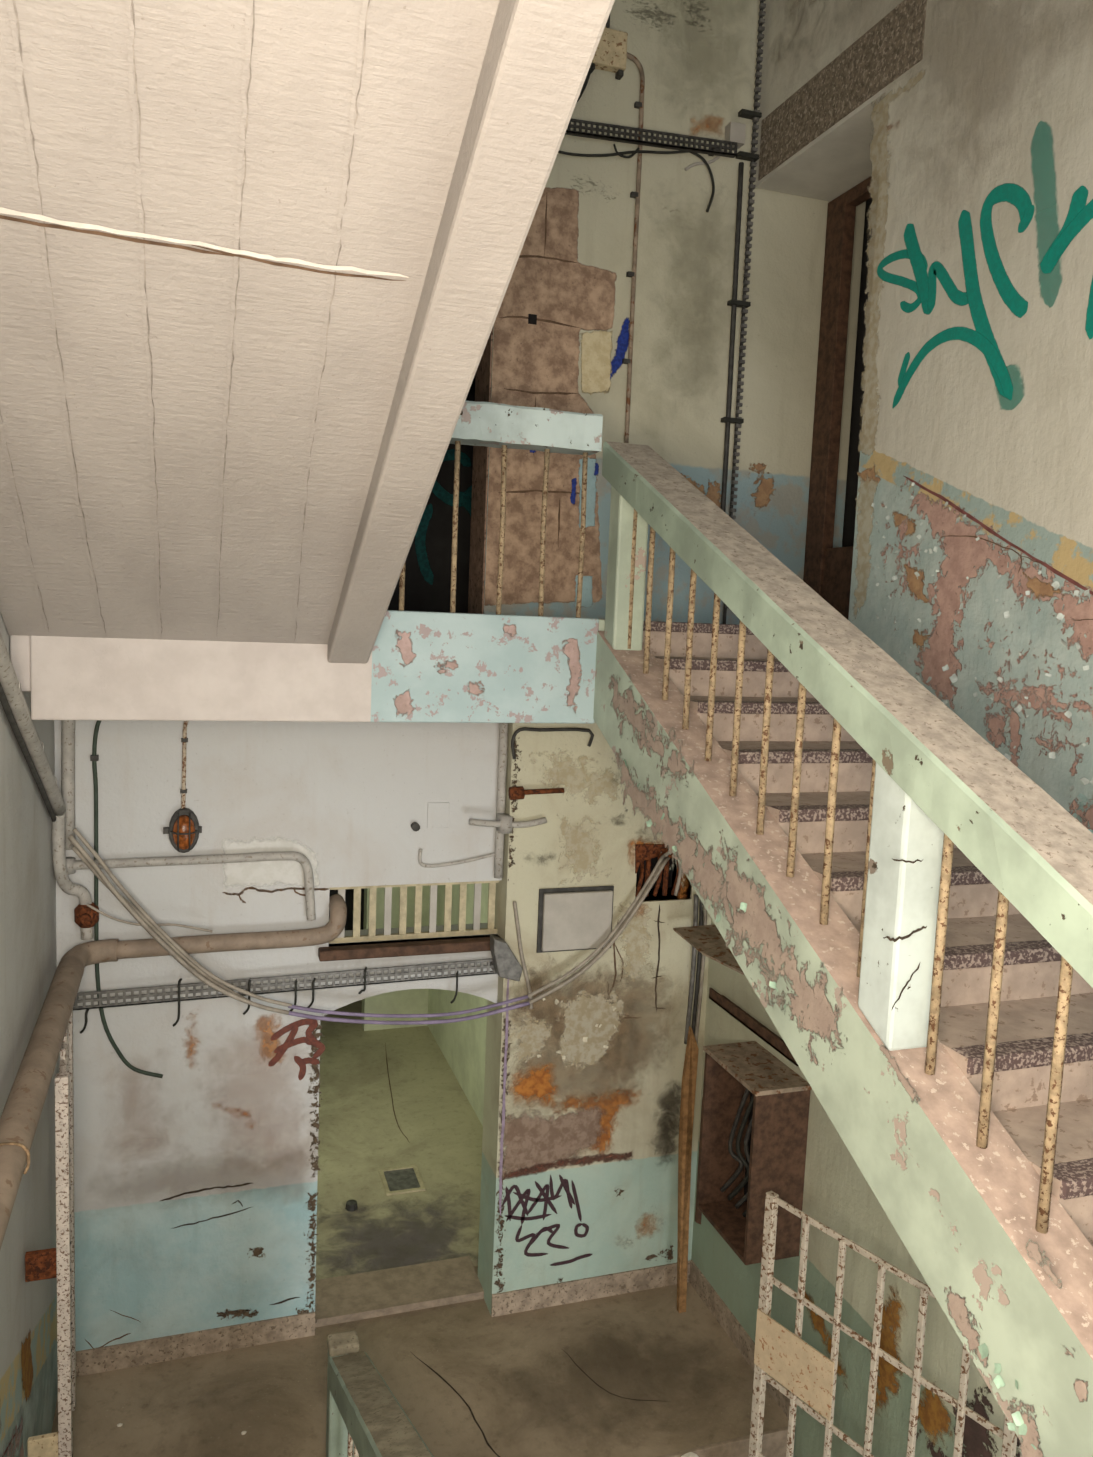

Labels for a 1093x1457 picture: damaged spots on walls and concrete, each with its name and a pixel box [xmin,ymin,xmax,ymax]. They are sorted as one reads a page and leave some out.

crack [0,207,409,281]
spalling [475,187,617,414]
spalling [468,446,603,614]
peeling [854,70,1093,833]
peeling [393,686,416,717]
peeling [394,629,416,667]
peeling [562,638,582,713]
peeling [608,674,848,1076]
spalling [493,990,624,1293]
corrosion [513,1065,636,1153]
water stain [657,1084,681,1160]
peeling [916,1286,1044,1457]